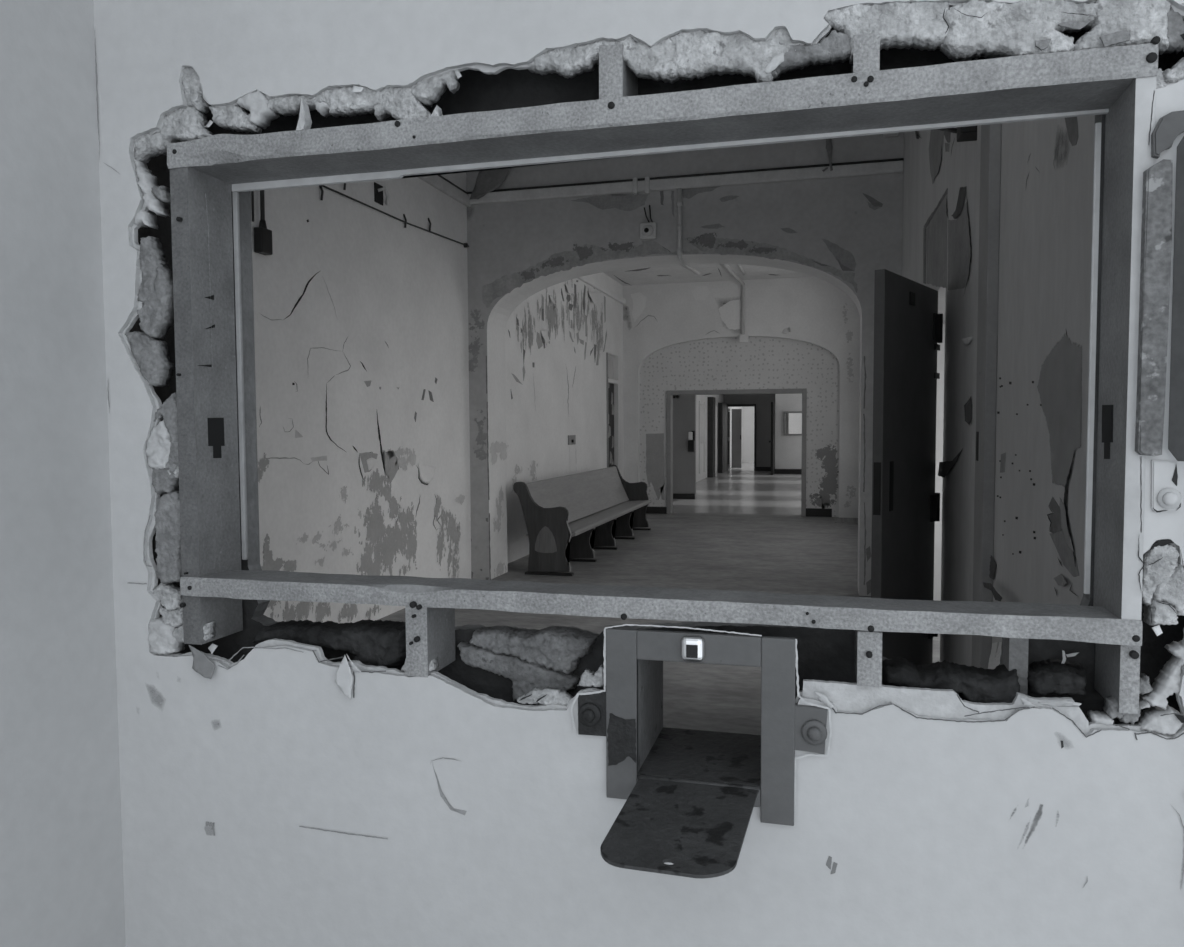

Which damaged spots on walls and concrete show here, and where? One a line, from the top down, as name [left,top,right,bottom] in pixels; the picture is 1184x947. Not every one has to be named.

spalling [527,0,1184,89]
peeling [469,168,510,200]
peeling [915,129,955,184]
peeling [923,187,972,290]
peeling [468,224,858,399]
spalling [126,67,462,700]
crack [261,271,366,465]
crack [377,414,391,475]
peeling [296,445,507,580]
peeling [938,450,962,478]
spalling [1052,539,1184,740]
peeling [815,692,1035,723]